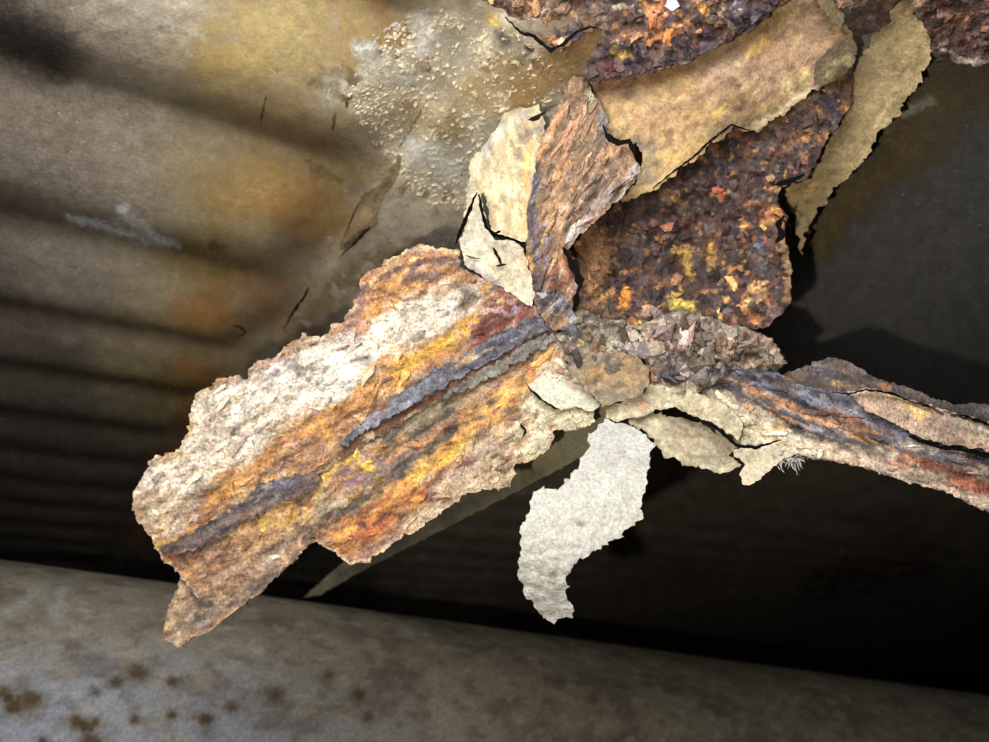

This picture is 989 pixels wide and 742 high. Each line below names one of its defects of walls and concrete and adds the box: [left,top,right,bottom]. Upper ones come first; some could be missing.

crack [259,96,267,125]
peeling [339,8,569,308]
peeling [589,0,858,202]
corrosion [799,0,989,258]
crack [283,287,310,329]
corrosion [132,0,854,648]
peeling [517,411,741,624]
corrosion [698,357,989,512]
corrosion [0,689,40,711]
corrosion [73,718,99,742]